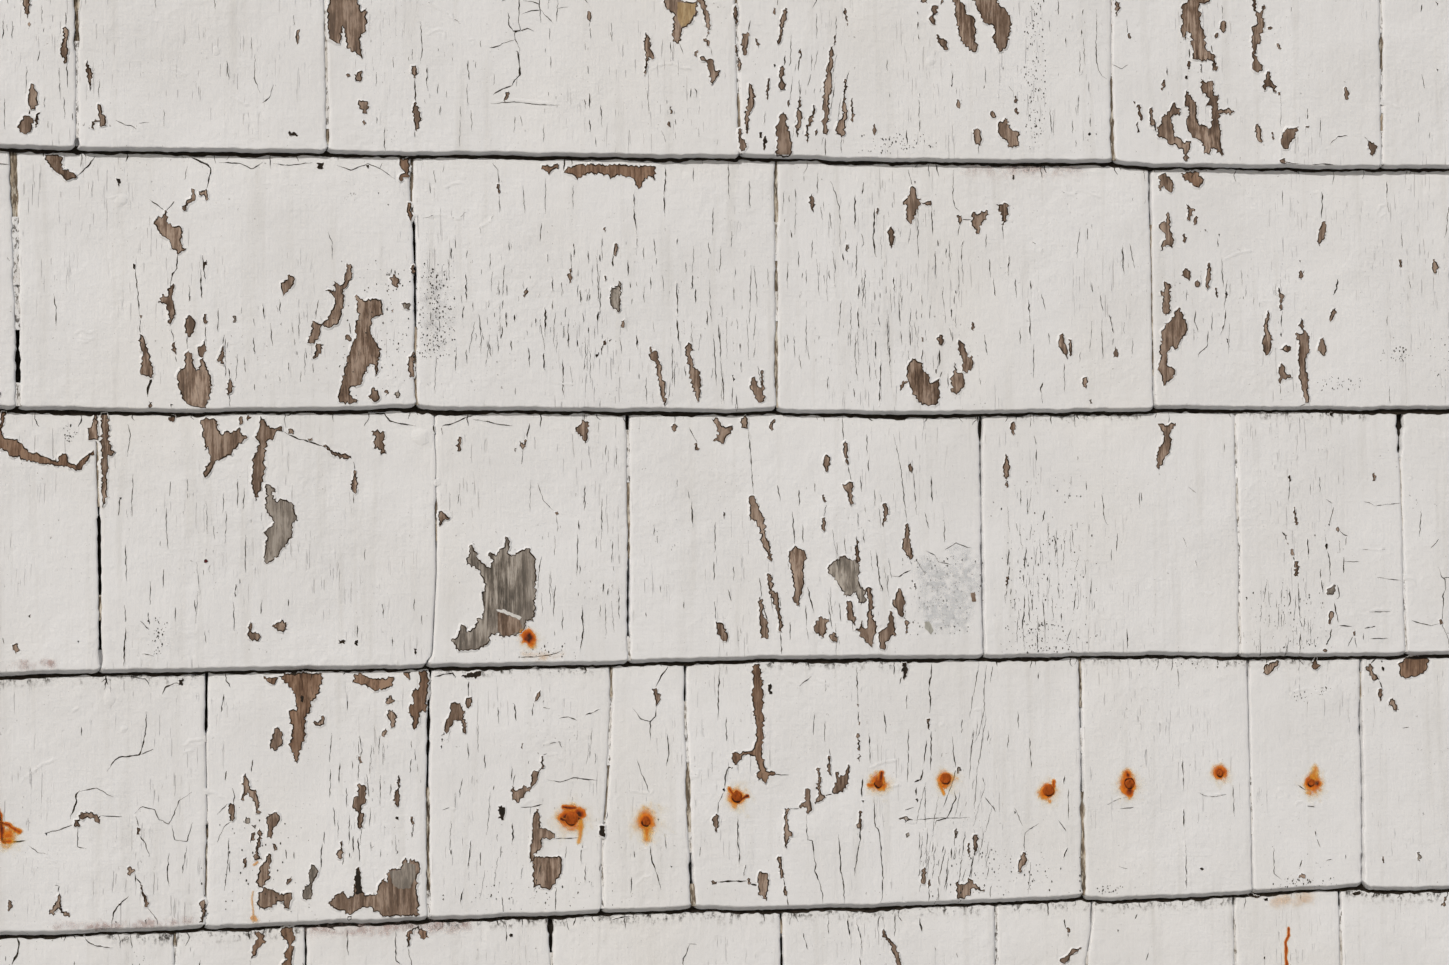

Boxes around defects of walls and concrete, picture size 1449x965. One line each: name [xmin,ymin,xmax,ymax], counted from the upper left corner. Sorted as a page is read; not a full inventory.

peeling [920,0,1013,54]
peeling [305,263,416,405]
peeling [151,201,359,565]
peeling [450,535,538,653]
peeling [262,670,327,763]
corrosion [556,805,586,844]
corrosion [727,787,750,808]
corrosion [867,770,887,791]
corrosion [1038,779,1056,803]
corrosion [1120,769,1136,799]
corrosion [1304,766,1322,795]
peeling [217,760,429,965]